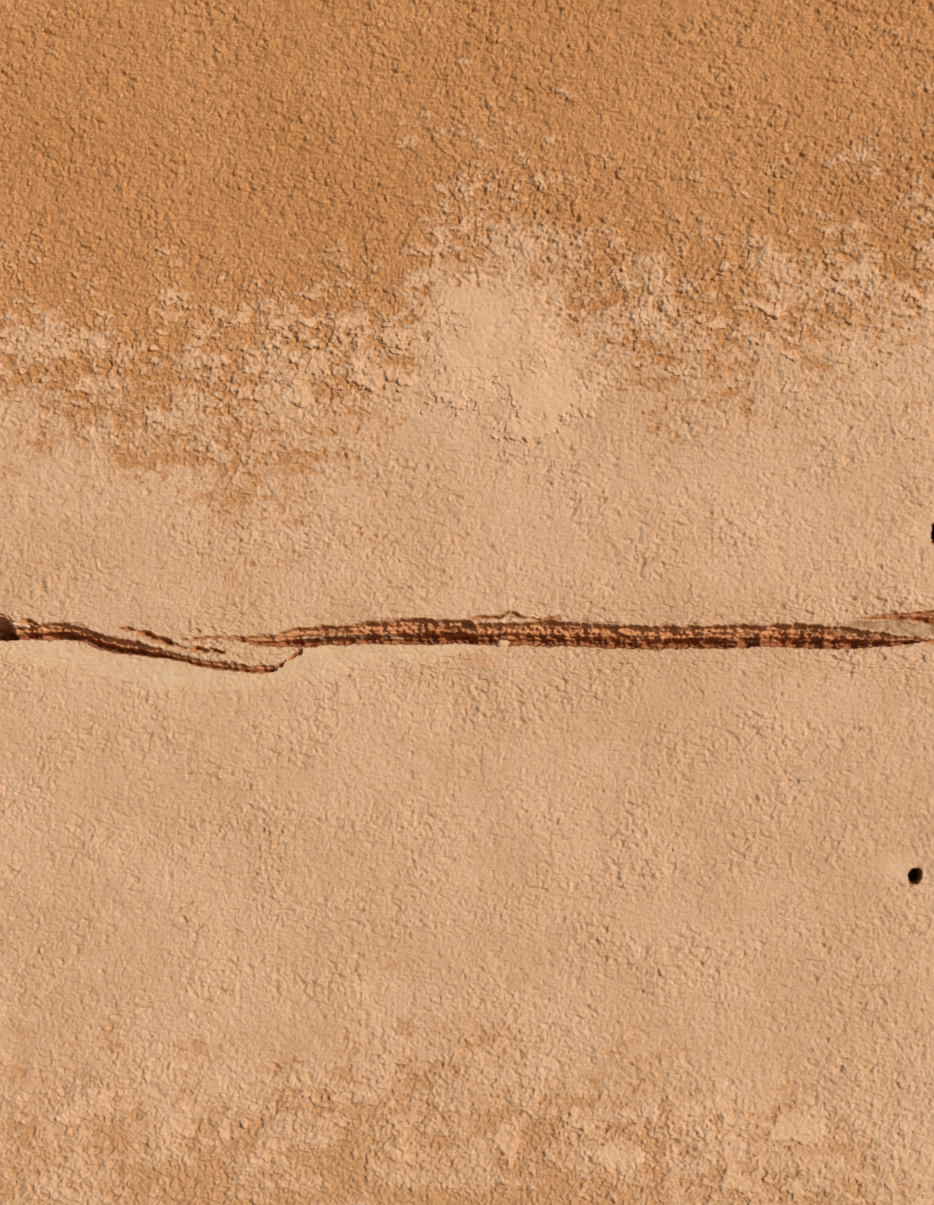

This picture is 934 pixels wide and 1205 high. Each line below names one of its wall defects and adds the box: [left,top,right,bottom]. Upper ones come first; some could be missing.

flaking render [697,264,797,345]
flaking render [781,246,882,363]
flaking render [893,284,934,330]
flaking render [0,260,629,452]
crack [0,611,934,674]